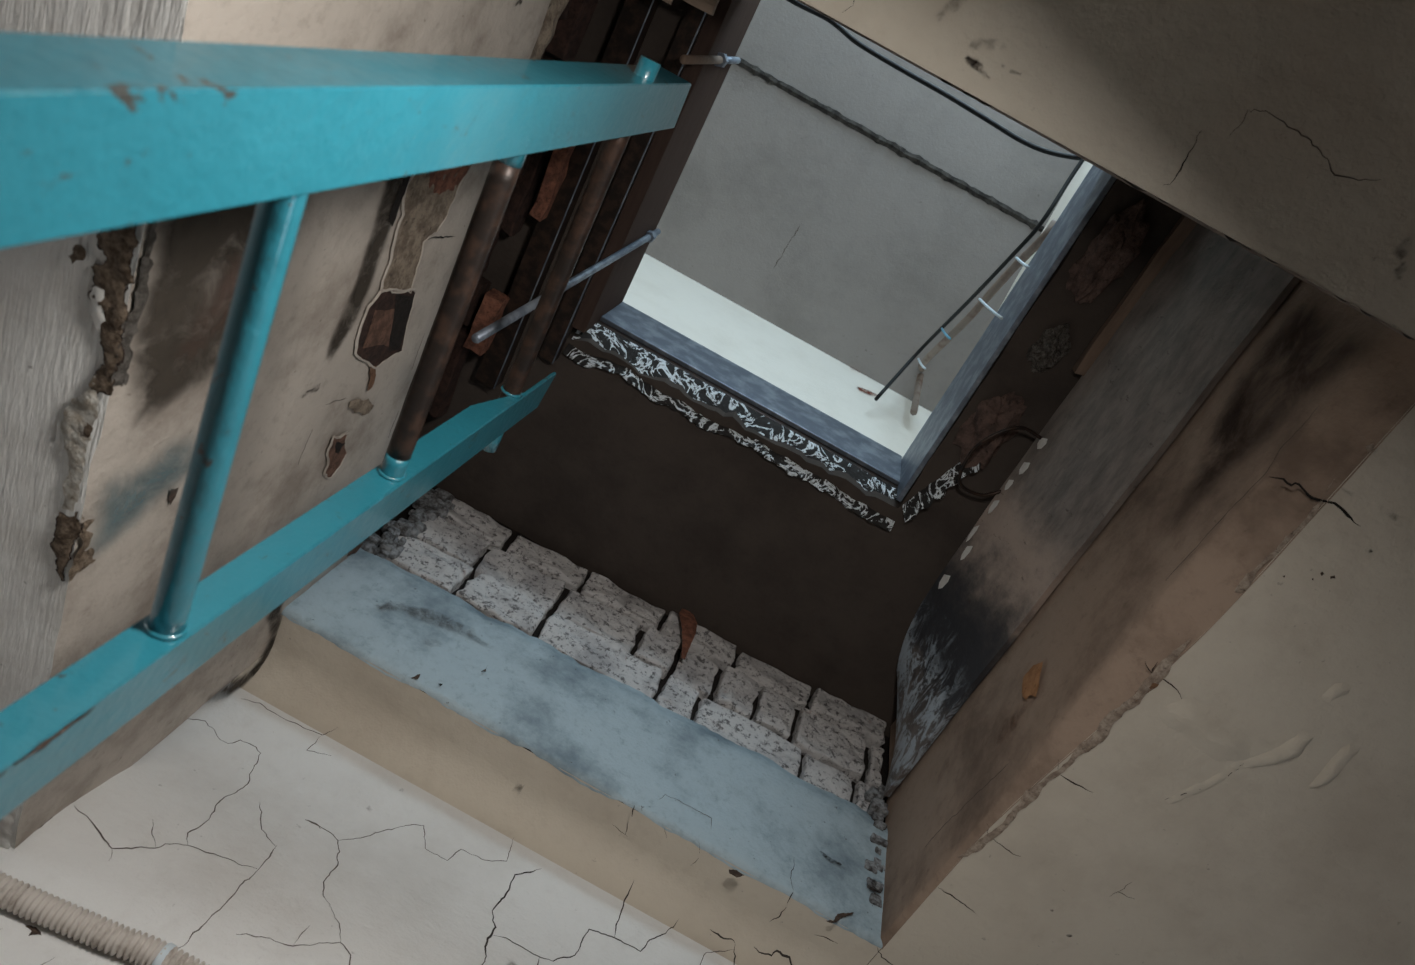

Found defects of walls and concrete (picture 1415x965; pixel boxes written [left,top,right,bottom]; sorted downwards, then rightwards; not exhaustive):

crack [1166,109,1381,185]
flaking render [349,164,473,415]
spalling [50,221,157,583]
flaking render [323,431,349,479]
crack [1165,406,1361,581]
damp [1196,310,1350,489]
crack [245,699,338,756]
crack [38,718,795,965]